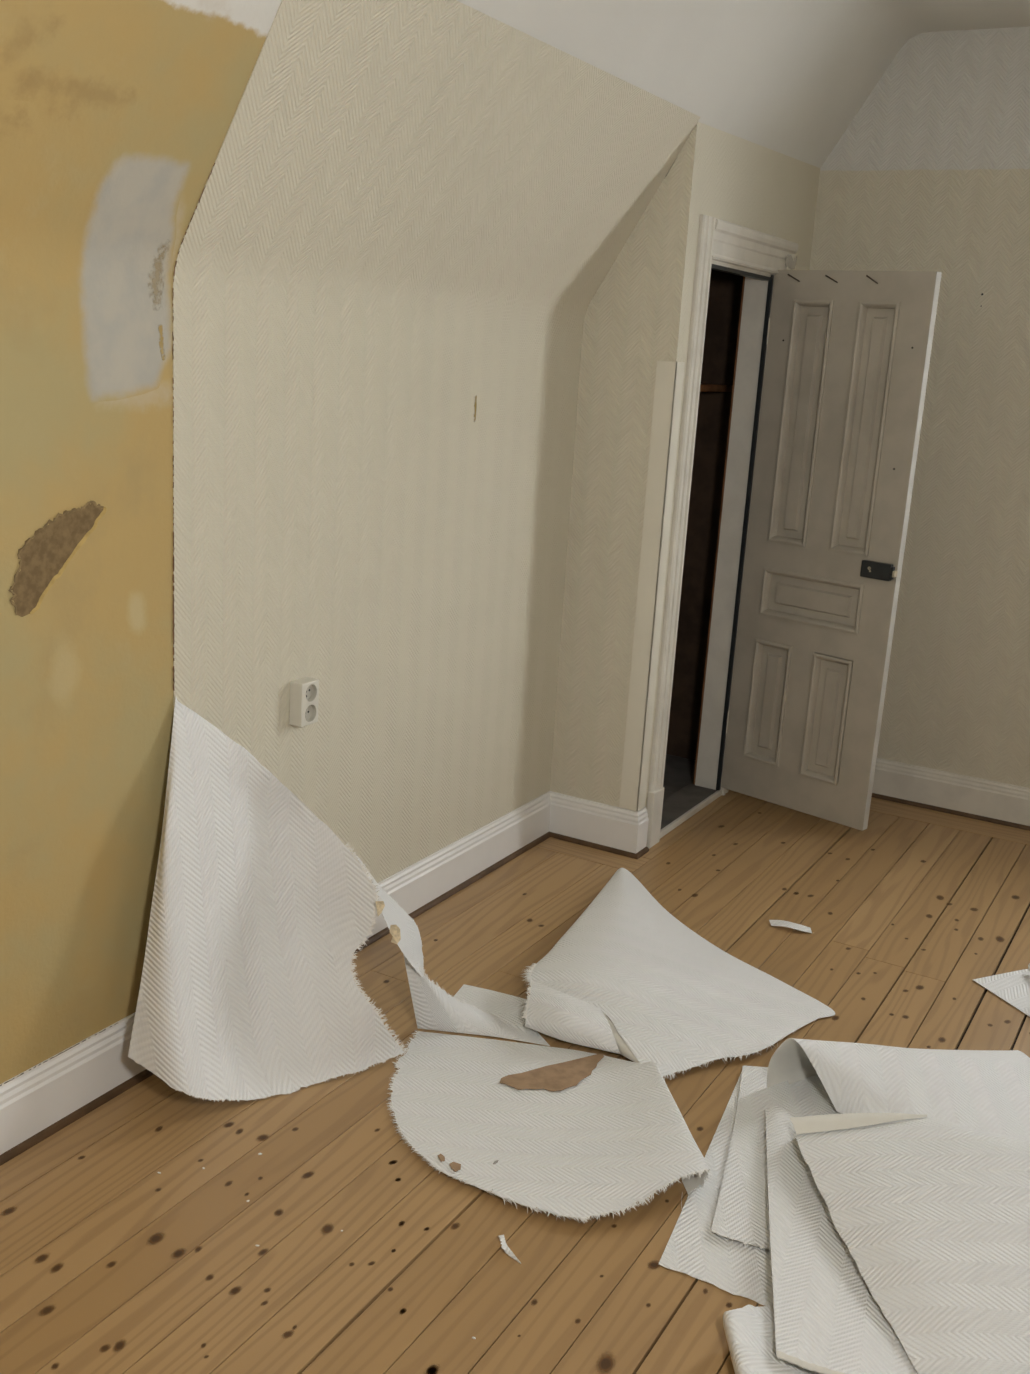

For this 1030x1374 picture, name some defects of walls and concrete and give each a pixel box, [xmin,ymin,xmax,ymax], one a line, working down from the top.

peeling [8,501,107,617]